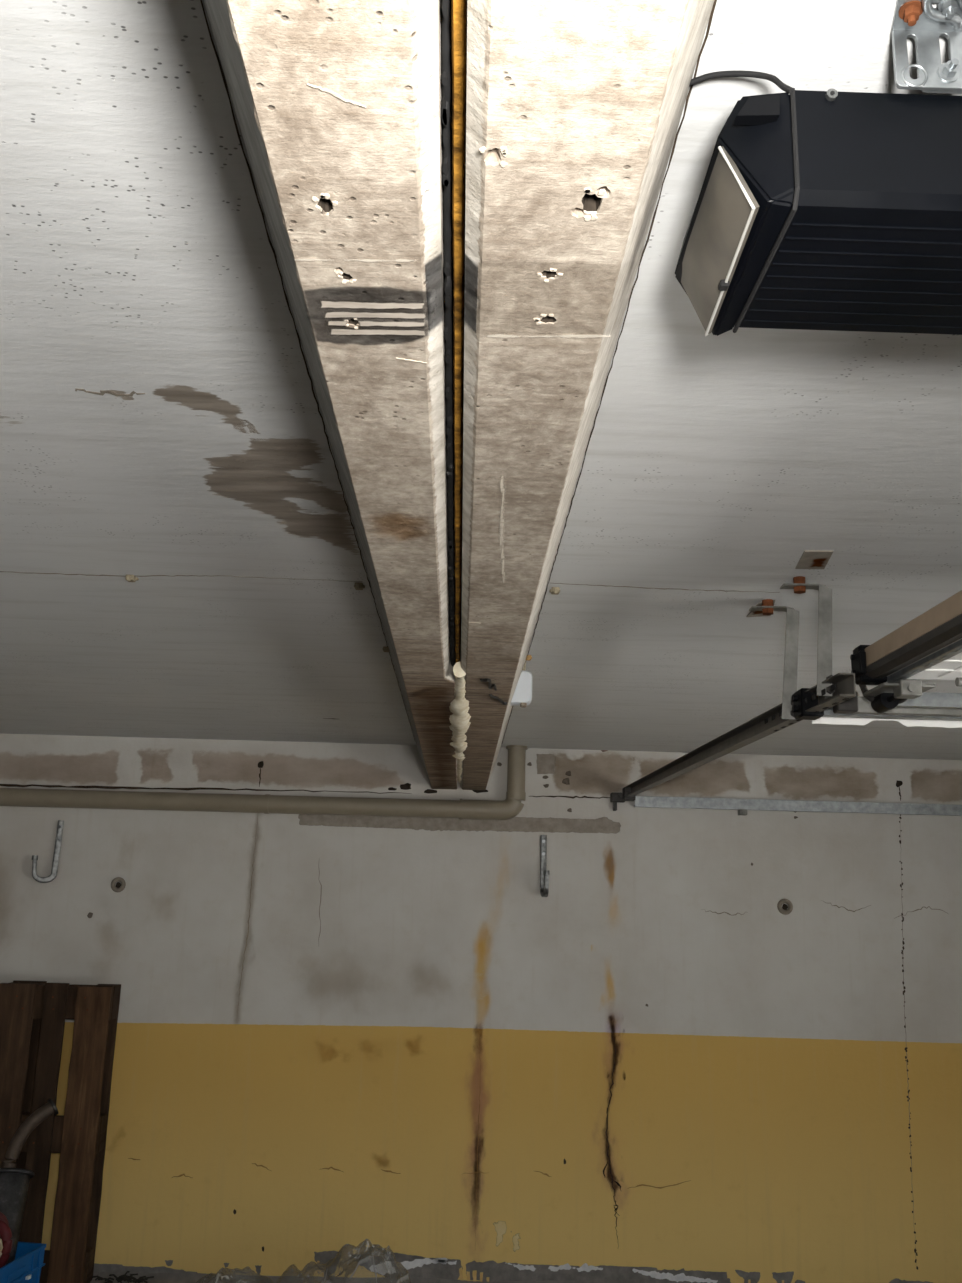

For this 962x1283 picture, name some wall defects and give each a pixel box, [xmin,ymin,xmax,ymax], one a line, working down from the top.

peeling [536,754,555,774]
crack [821,814,948,1270]
peeling [358,1253,805,1283]